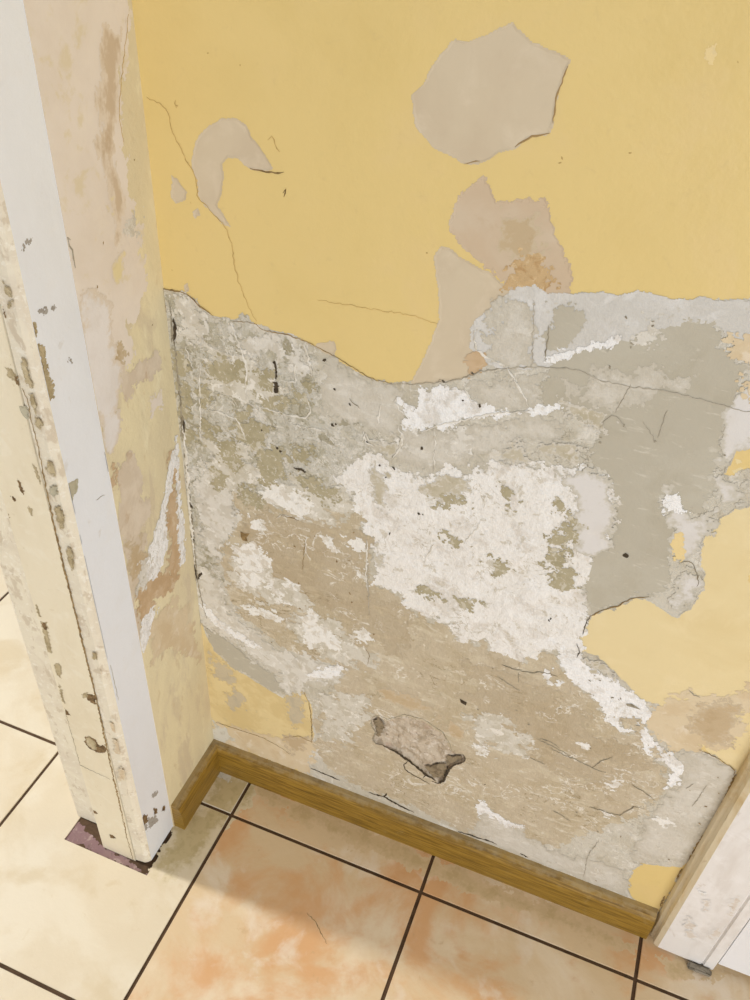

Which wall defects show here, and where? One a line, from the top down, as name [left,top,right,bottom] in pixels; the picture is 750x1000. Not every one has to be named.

spalling [5,358,44,430]
spalling [35,604,71,716]
spalling [32,461,78,530]
spalling [84,720,121,755]
peeling [65,822,148,875]
peeling [24,0,238,419]
peeling [170,118,283,227]
peeling [116,450,541,864]
peeling [249,22,608,480]
leakage [124,347,750,851]
crack [148,98,750,633]
spalling [522,649,734,900]